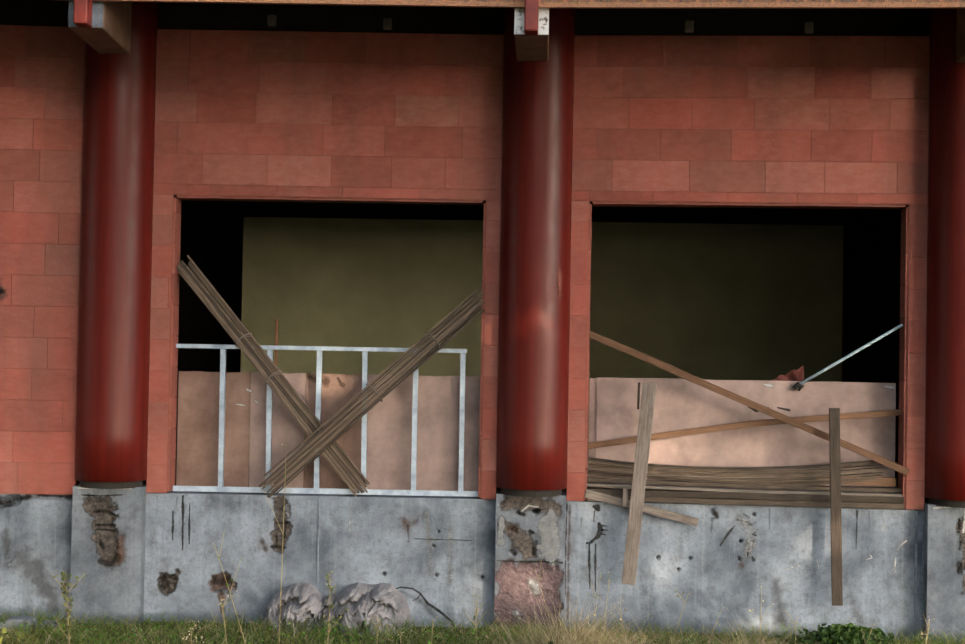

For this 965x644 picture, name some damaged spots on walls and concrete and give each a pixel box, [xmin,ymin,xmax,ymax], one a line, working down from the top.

spalling [0,487,132,567]
spalling [158,569,180,596]
spalling [261,495,292,554]
peeling [481,495,564,632]
spalling [956,518,965,594]